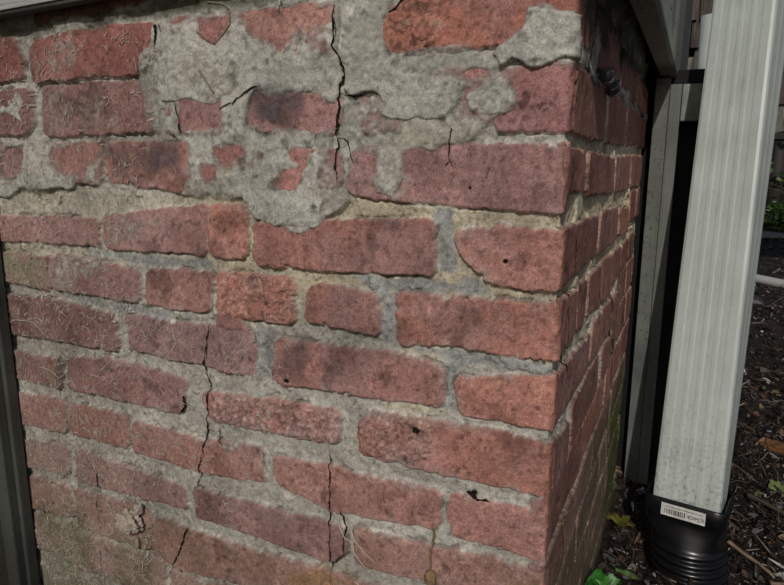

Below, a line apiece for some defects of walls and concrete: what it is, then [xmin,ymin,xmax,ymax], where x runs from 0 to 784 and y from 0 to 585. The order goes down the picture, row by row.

peeling [154,33,239,105]
crack [330,2,372,187]
spalling [384,0,444,53]
peeling [344,64,516,120]
peeling [493,6,583,69]
crack [192,327,223,493]
crack [328,450,347,580]